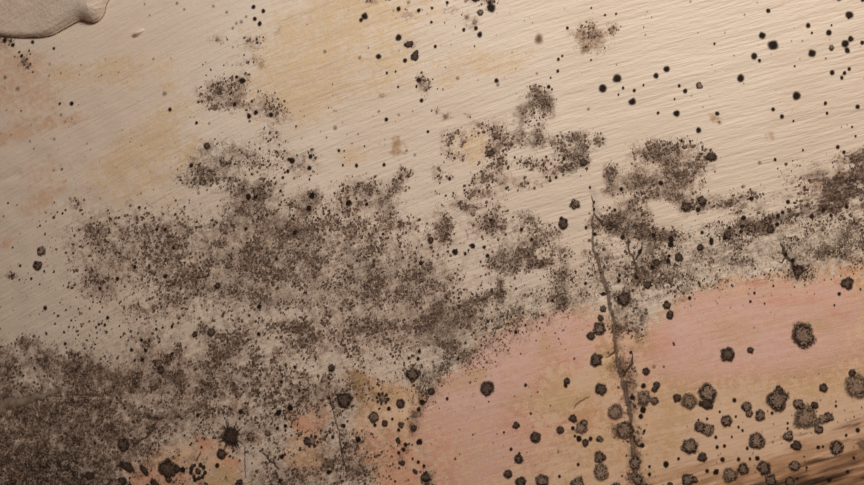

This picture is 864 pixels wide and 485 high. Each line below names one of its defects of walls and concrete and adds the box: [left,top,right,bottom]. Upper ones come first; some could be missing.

water stain [396,34,419,62]
water stain [566,12,620,61]
water stain [809,24,864,59]
water stain [599,64,644,104]
water stain [197,72,293,142]
water stain [28,236,65,279]
crack [627,238,643,275]
crack [591,195,640,485]